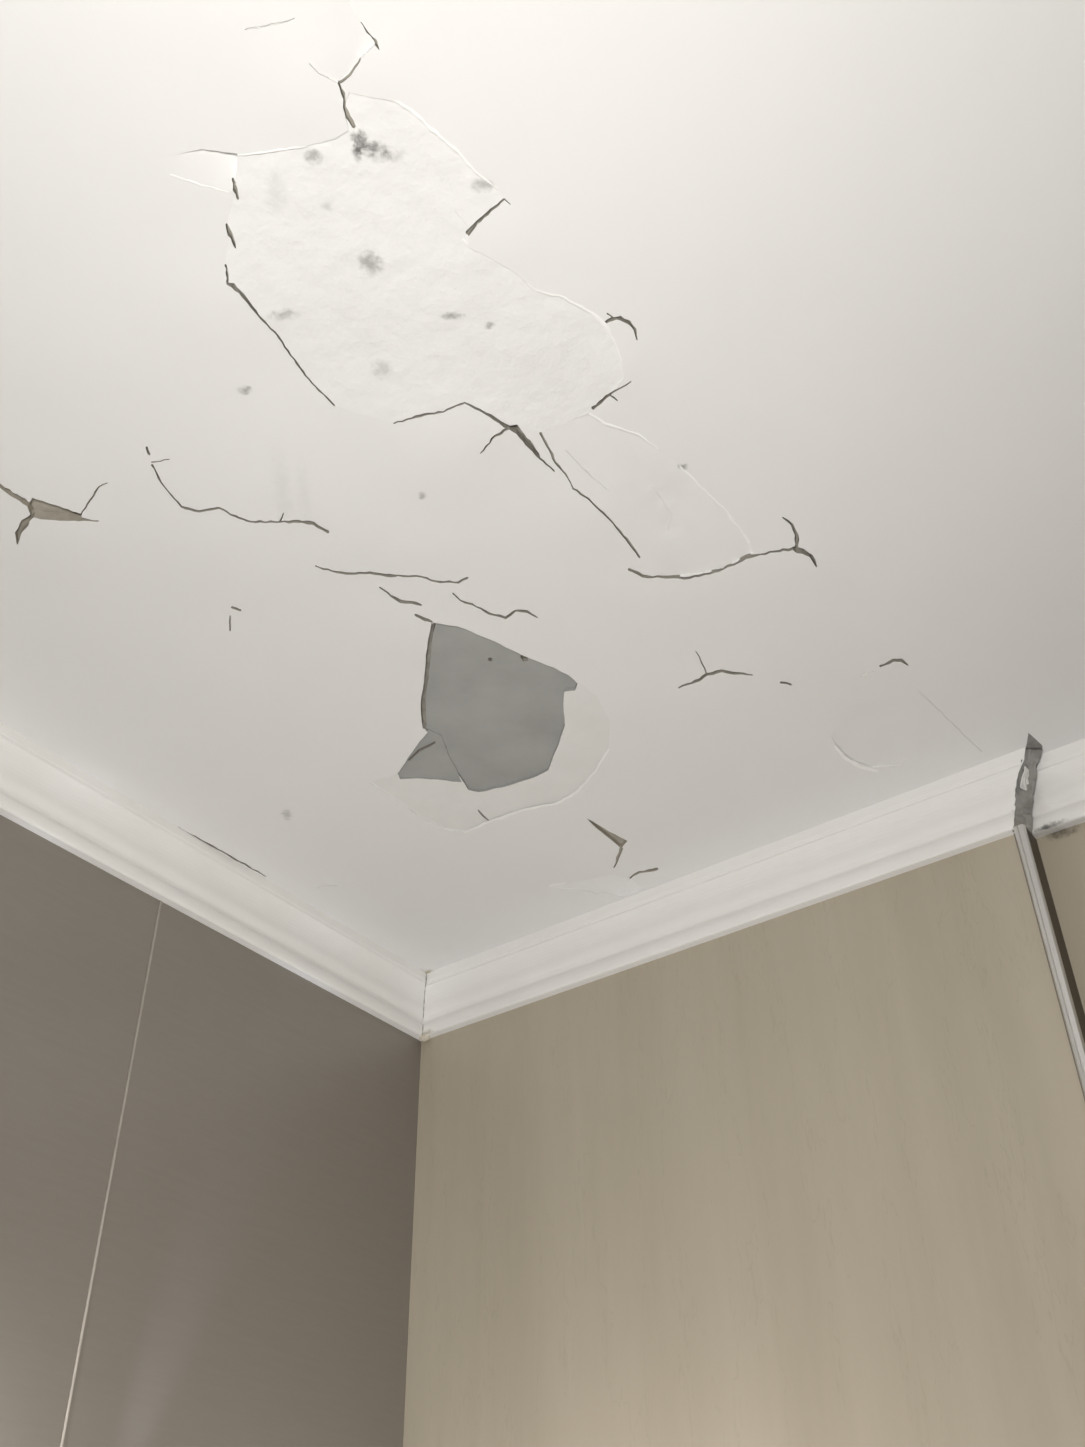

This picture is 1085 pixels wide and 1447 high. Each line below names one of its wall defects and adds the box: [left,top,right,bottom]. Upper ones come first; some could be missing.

crack [245,18,294,30]
crack [309,0,379,128]
crack [455,198,511,236]
crack [225,178,335,406]
crack [605,313,638,340]
crack [591,381,631,410]
crack [145,446,329,533]
crack [393,402,817,580]
crack [229,606,241,631]
crack [315,565,538,623]
crack [678,652,792,688]
flaking render [370,623,610,833]